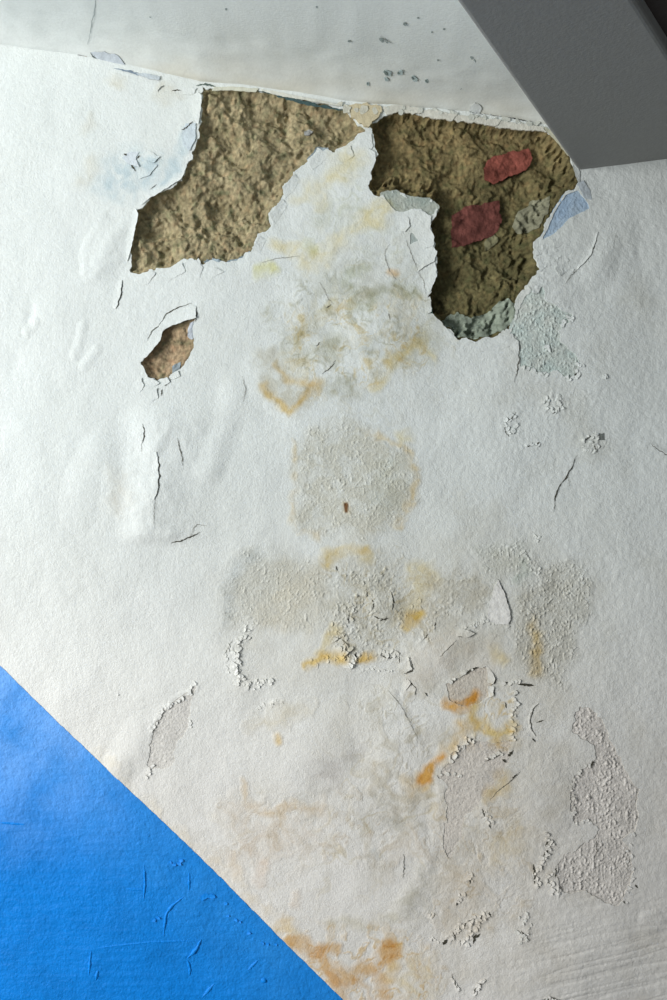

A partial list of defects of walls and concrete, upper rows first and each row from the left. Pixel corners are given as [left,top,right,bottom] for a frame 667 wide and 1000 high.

spalling [80,51,592,382]
spalling [136,303,197,402]
crack [141,424,183,523]
crack [554,459,575,509]
peeling [581,433,604,454]
water stain [90,138,596,1000]
peeling [224,625,274,690]
corrosion [300,621,376,673]
peeling [145,681,196,780]
corrosion [437,685,524,753]
peeling [532,707,639,906]
corrosion [276,912,450,1000]